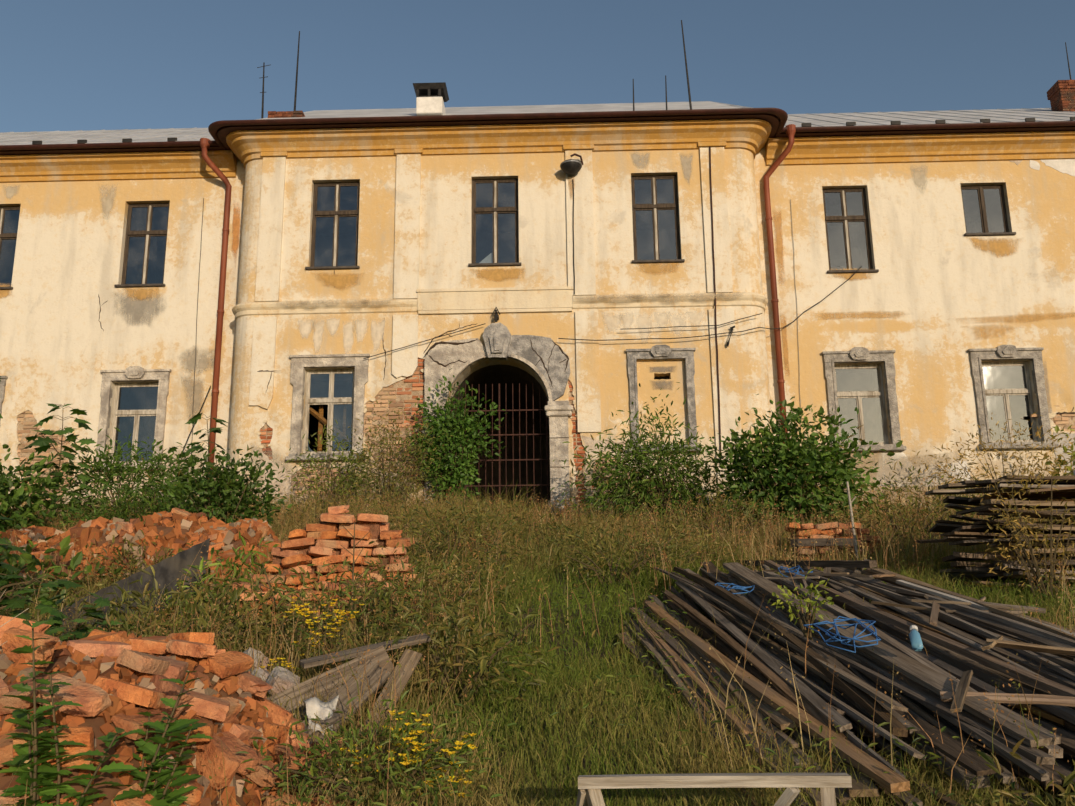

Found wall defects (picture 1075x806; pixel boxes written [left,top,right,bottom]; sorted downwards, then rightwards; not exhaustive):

peeling [1009,159,1075,176]
water stain [121,289,159,323]
flaking render [256,420,355,503]
flaking render [363,357,425,486]
flaking render [568,379,635,511]